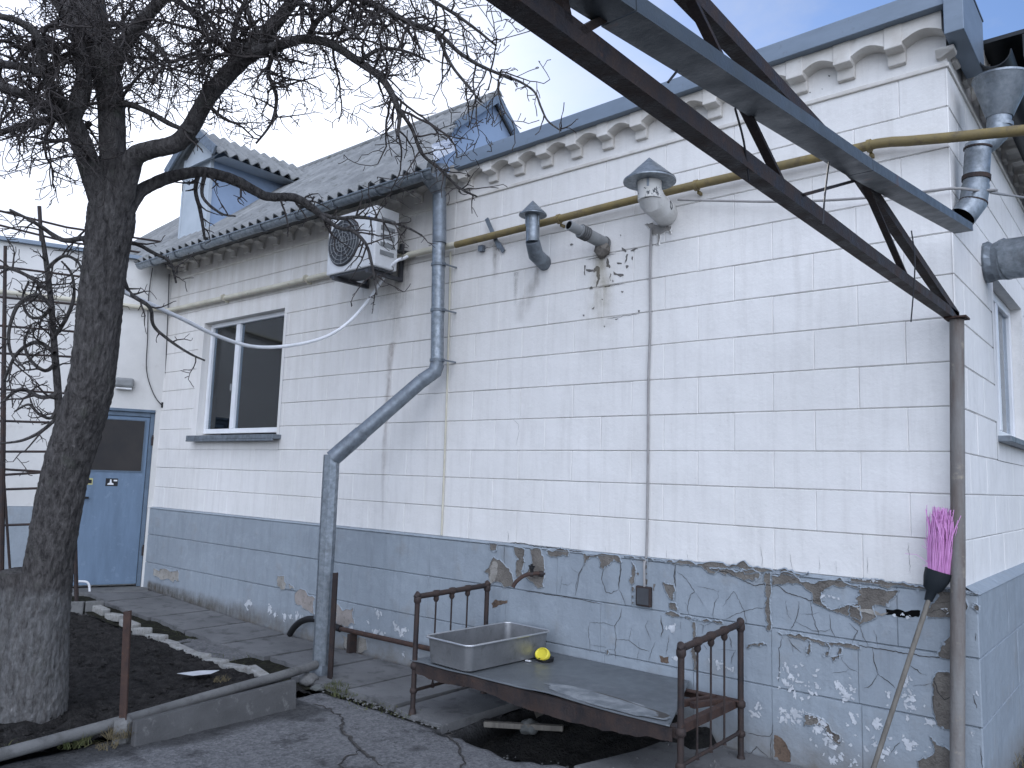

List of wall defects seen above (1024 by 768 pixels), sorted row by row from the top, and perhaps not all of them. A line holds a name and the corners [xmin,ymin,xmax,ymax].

peeling [268,575,316,622]
peeling [336,603,409,654]
crack [508,535,977,707]
flaking render [583,553,950,768]
crack [315,704,383,768]